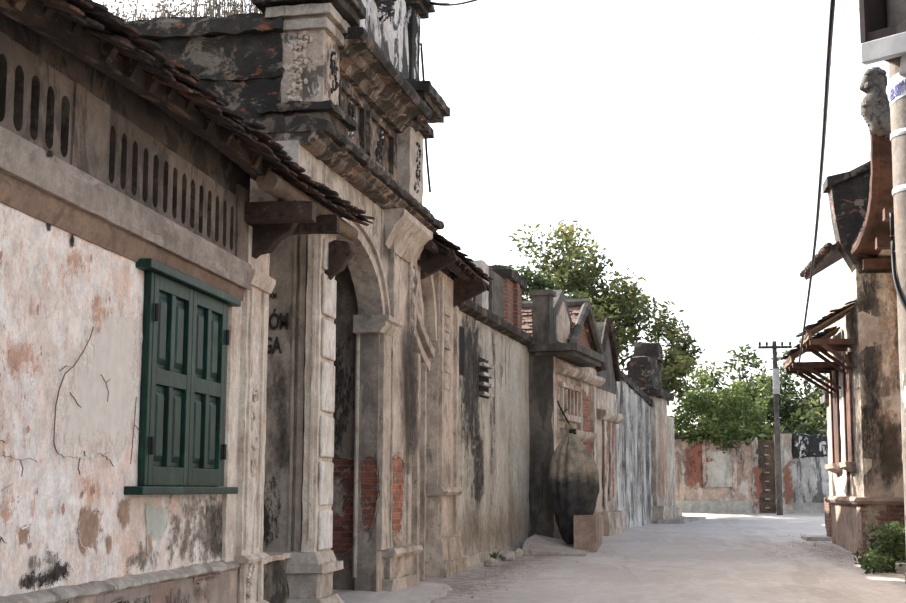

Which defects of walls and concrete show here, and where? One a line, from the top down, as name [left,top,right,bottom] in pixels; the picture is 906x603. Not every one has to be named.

crack [0,327,140,491]
leakage [453,314,503,533]
leakage [847,265,903,497]
flaking render [0,490,76,603]
flaking render [77,466,112,555]
flaking render [112,492,130,529]
peeling [123,486,223,603]
leakage [206,502,222,560]
flaking render [330,453,380,556]
flaking render [392,452,405,547]